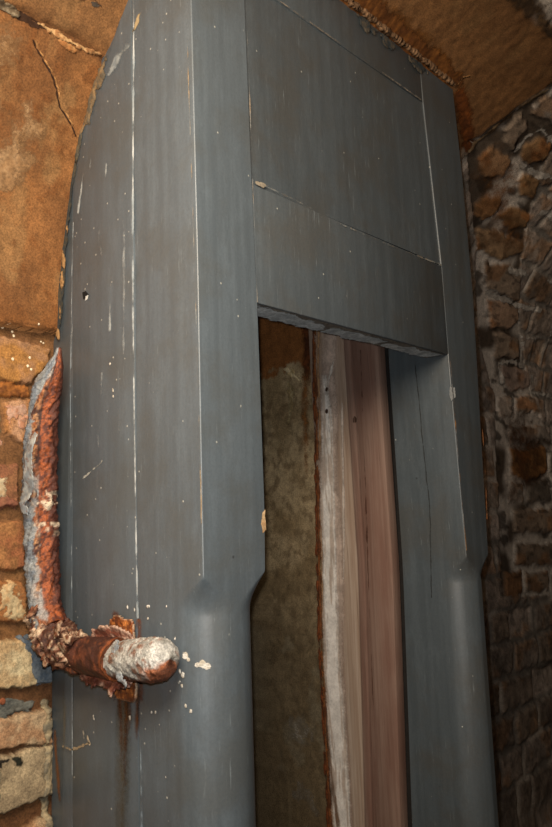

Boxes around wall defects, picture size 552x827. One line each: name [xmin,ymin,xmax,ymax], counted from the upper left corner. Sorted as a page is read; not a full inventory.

crack [33,40,79,137]
corrosion [301,327,334,827]
crack [415,366,432,598]